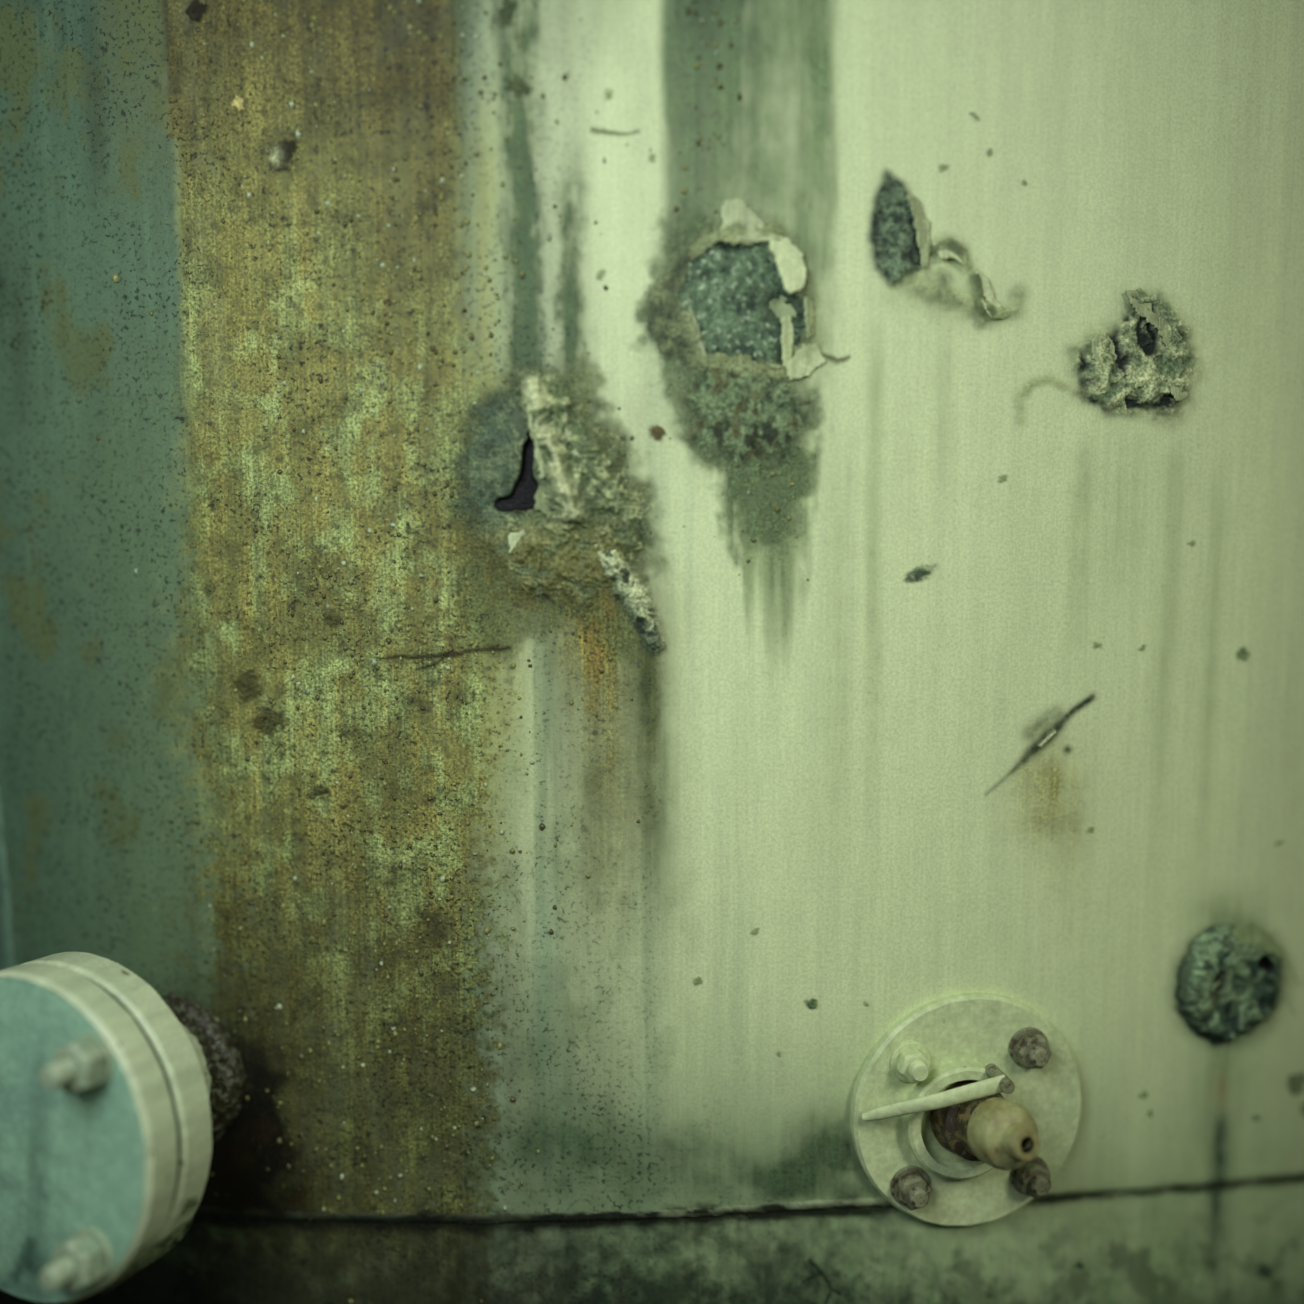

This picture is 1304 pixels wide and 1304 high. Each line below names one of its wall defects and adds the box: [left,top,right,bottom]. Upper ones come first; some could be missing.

water stain [664,0,830,250]
peeling [870,170,1019,323]
spalling [637,199,826,543]
water stain [728,450,809,595]
corrosion [164,0,897,1270]
water stain [637,640,659,749]
water stain [752,1128,851,1199]
corrosion [1029,1174,1304,1203]